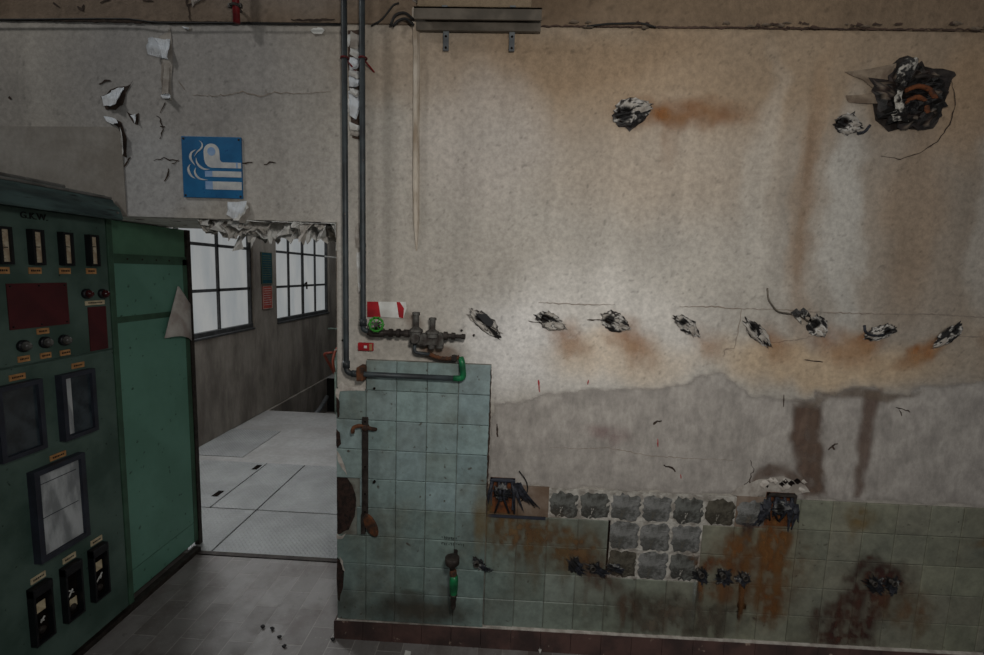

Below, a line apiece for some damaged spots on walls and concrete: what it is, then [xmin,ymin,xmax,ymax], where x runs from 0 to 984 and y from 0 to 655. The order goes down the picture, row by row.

peeling [146,26,173,100]
crack [124,82,330,182]
peeling [347,30,360,139]
hole [833,55,956,136]
peeling [196,199,336,251]
peeling [488,373,984,601]
damp [754,405,824,495]
damp [843,390,895,496]
corrosion [495,514,599,566]
corrosion [725,518,792,621]